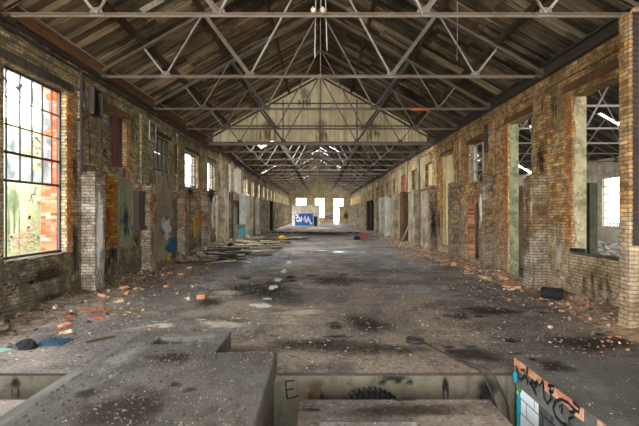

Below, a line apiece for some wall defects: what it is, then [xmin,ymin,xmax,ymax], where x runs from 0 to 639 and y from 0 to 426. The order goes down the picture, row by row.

water stain [354,378,451,416]